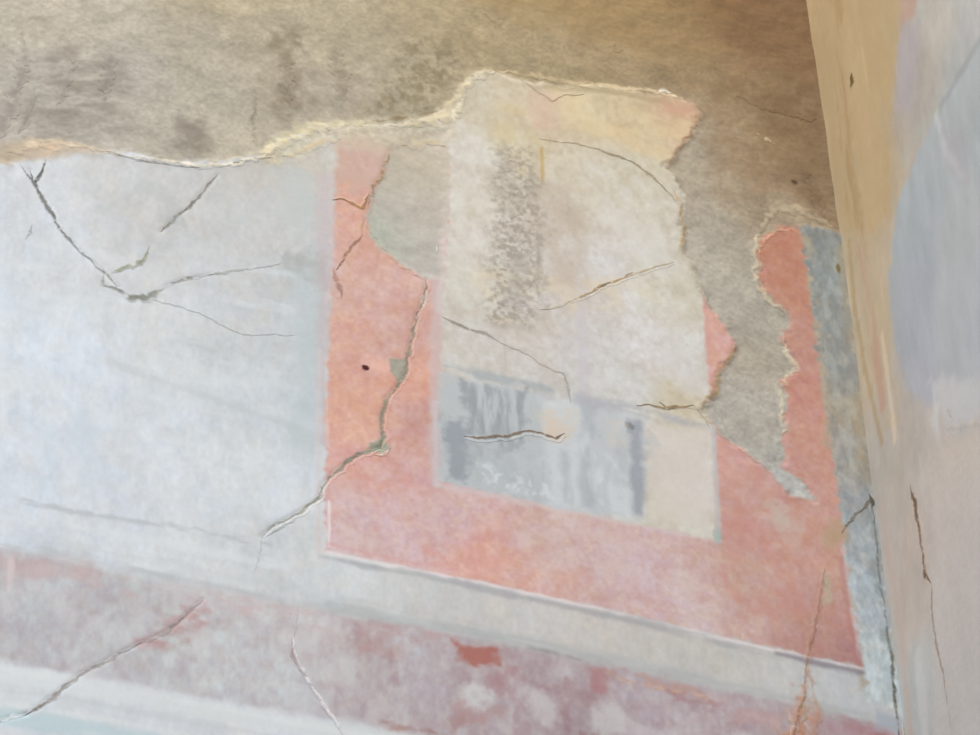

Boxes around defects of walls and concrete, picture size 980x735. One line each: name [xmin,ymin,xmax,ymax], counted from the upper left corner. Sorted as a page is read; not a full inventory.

crack [22,160,291,336]
crack [332,193,369,297]
flaking render [0,0,840,502]
crack [254,280,571,569]
crack [637,402,710,427]
crack [0,600,203,722]
crack [791,566,825,735]
crack [841,493,905,735]
crack [909,485,953,735]